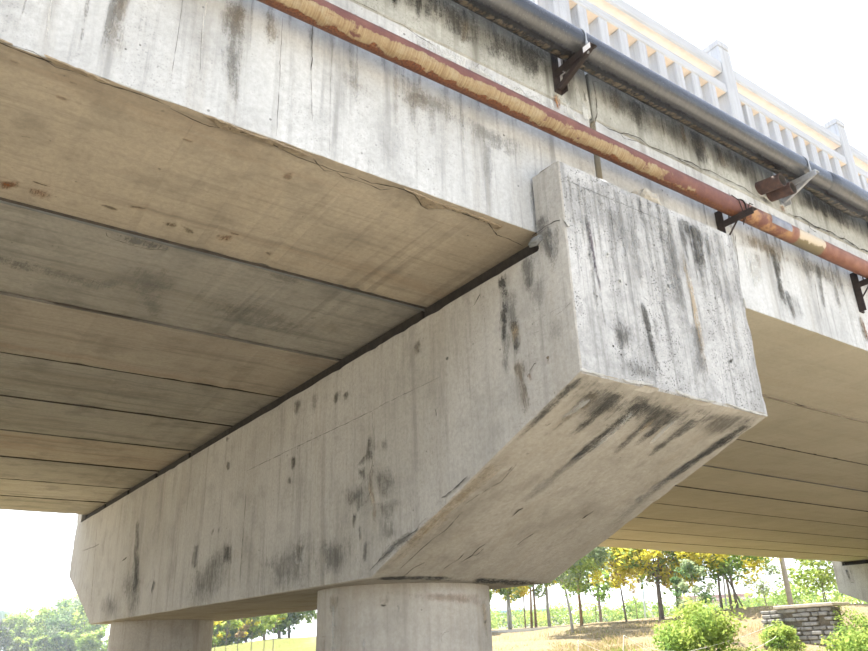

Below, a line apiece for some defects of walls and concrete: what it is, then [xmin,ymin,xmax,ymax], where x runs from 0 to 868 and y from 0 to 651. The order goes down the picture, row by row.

spalling [0,39,525,247]
crack [569,81,757,197]
damp [587,222,600,285]
damp [682,222,704,272]
damp [751,238,795,314]
crack [790,214,868,252]
damp [499,277,520,351]
damp [641,305,657,361]
damp [526,379,580,432]
damp [576,394,620,432]
damp [570,402,697,462]
damp [655,424,751,490]